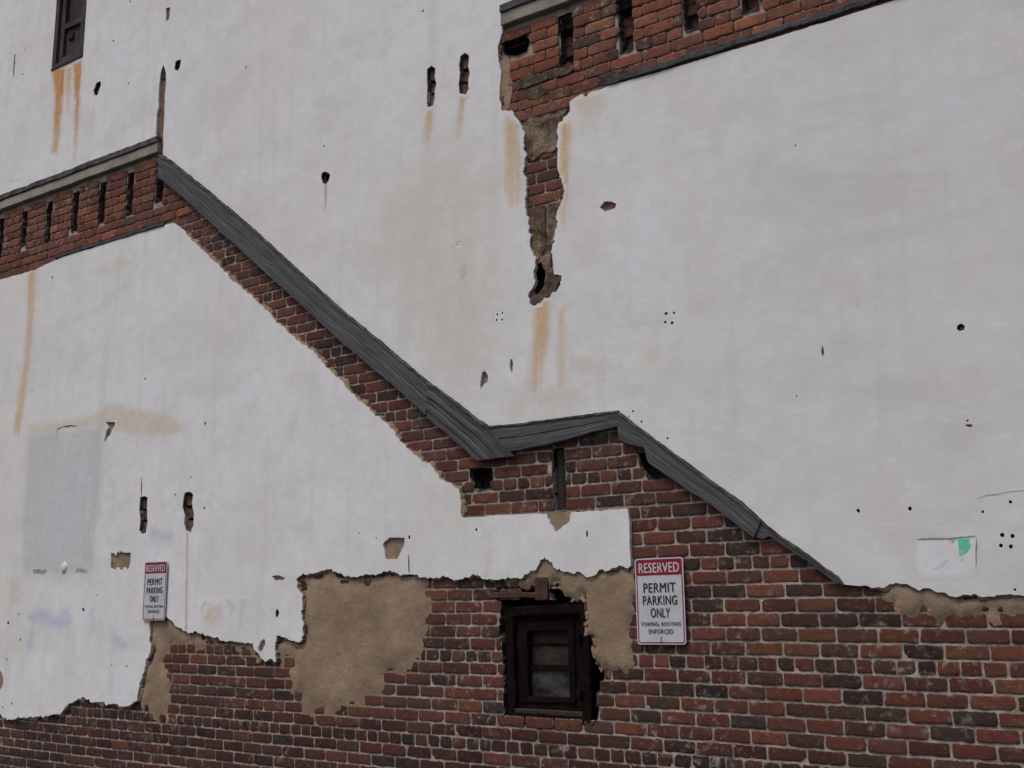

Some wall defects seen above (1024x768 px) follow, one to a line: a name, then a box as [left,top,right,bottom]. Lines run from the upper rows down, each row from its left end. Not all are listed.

corrosion [49,58,85,166]
spalling [500,55,575,306]
corrosion [10,269,40,443]
corrosion [520,294,572,393]
spalling [548,511,574,532]
spalling [0,537,646,768]
spalling [860,583,1024,628]